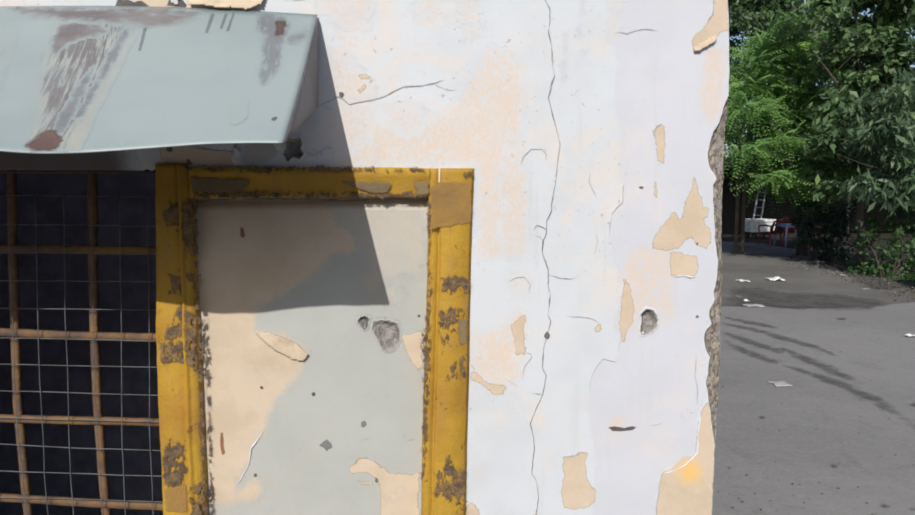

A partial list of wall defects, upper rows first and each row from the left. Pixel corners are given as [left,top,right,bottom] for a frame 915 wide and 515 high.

peeling [132,0,264,11]
rust [0,6,202,171]
crack [319,79,455,110]
crack [512,1,597,515]
peeling [613,0,729,515]
peeling [195,197,428,515]
peeling [604,411,636,436]
peeling [466,503,480,515]
peeling [561,452,596,510]